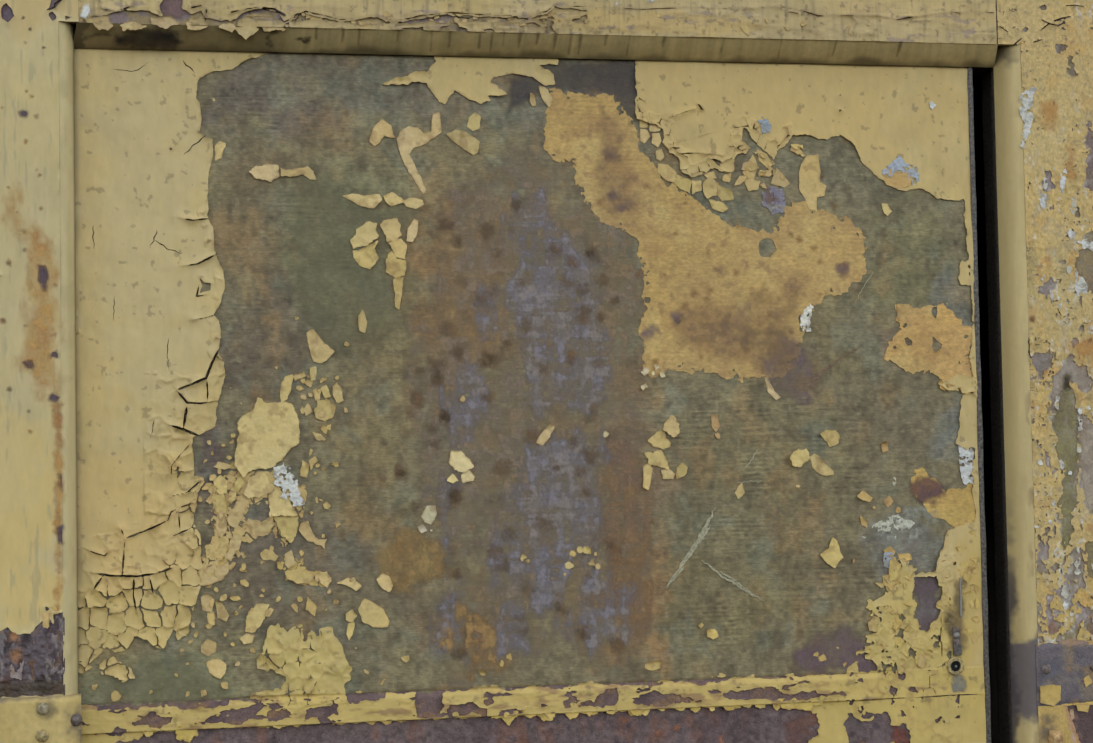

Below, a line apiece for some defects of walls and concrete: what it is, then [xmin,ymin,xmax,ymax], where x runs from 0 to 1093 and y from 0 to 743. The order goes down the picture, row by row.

peeling [1077,232,1093,299]
corrosion [24,232,63,487]
peeling [78,53,981,706]
crack [91,339,219,608]
corrosion [911,478,944,504]
peeling [1031,340,1093,606]
corrosion [0,606,65,717]
peeling [175,726,198,742]
peeling [491,698,823,726]